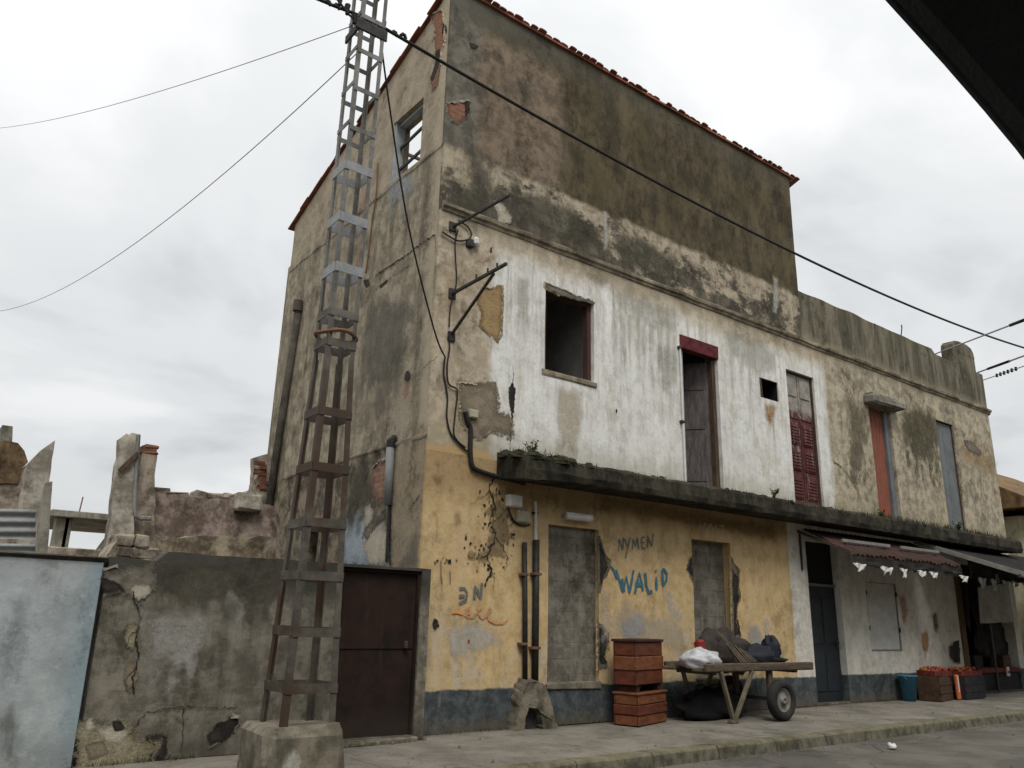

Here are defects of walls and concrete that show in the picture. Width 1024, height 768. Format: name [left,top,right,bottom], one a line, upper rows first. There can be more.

flaking render [430,9,447,92]
flaking render [444,99,472,125]
damp [512,191,677,278]
peeling [475,285,504,343]
peeling [455,378,515,442]
peeling [344,457,393,567]
crack [468,478,508,588]
flaking render [597,534,612,593]
crack [123,591,236,757]
flaking render [948,640,961,665]
flaking render [206,713,242,750]